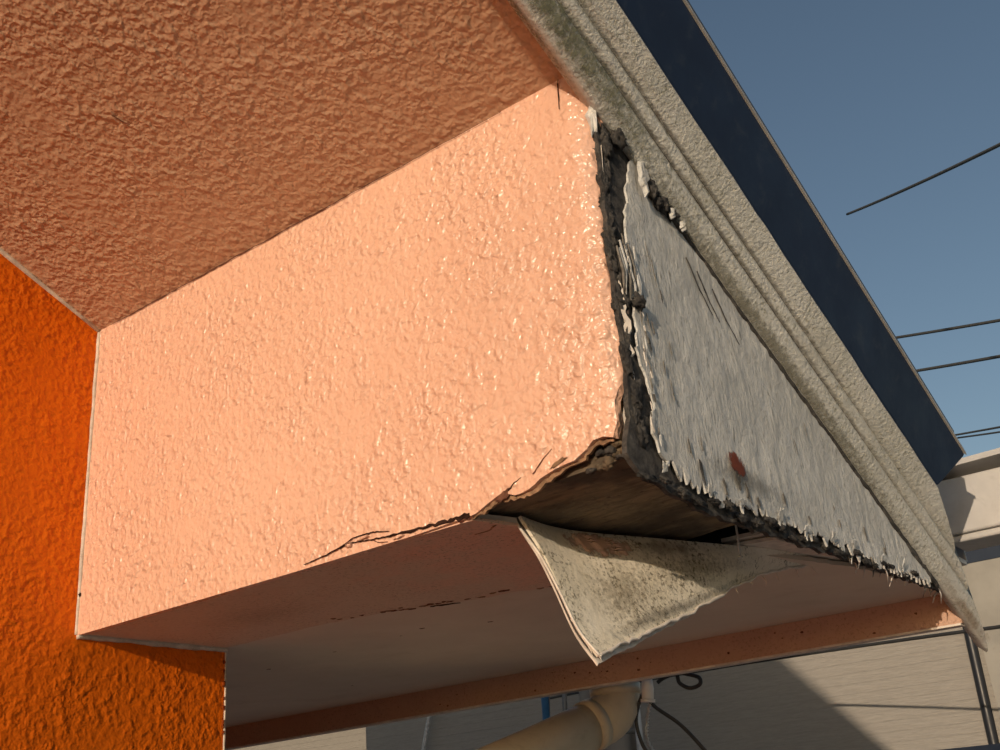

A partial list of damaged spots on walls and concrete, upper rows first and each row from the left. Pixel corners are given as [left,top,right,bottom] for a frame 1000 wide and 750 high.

spalling [584,106,597,138]
peeling [621,234,663,303]
peeling [618,280,675,446]
crack [508,450,551,491]
peeling [687,437,761,508]
corrosion [729,451,746,477]
crack [304,513,497,565]
peeling [380,589,510,613]